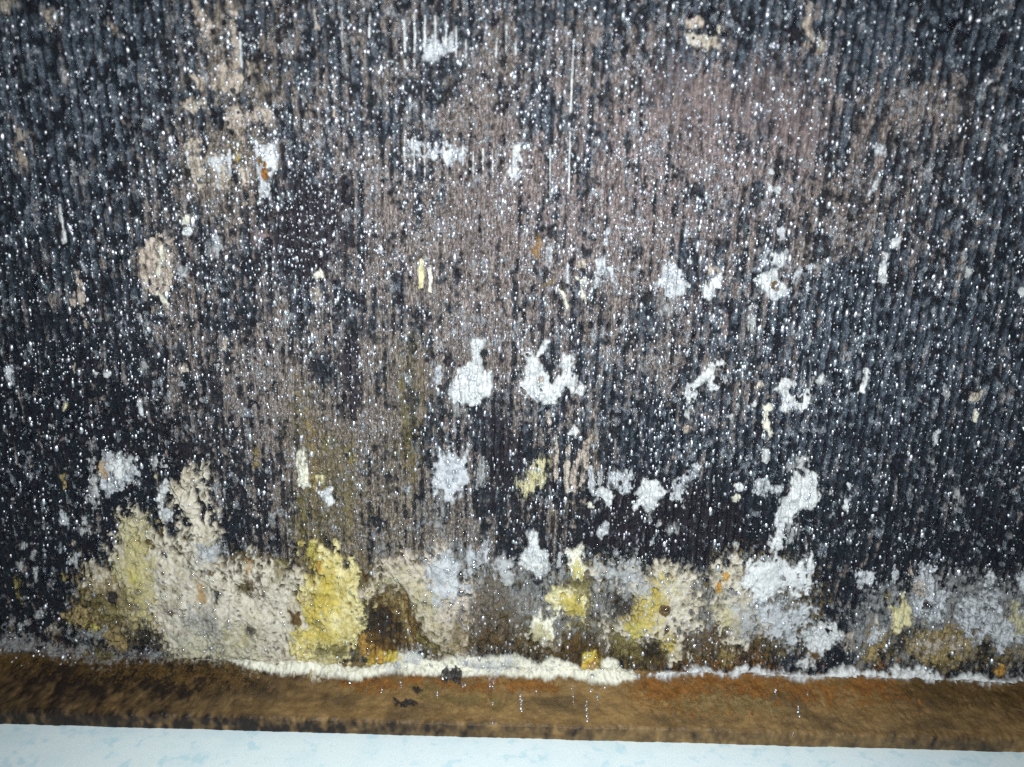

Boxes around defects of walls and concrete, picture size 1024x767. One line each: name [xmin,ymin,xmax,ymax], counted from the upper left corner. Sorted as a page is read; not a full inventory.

damp [504,142,523,188]
damp [762,164,782,194]
damp [182,214,195,236]
damp [211,235,224,258]
damp [241,163,383,303]
damp [558,228,622,309]
damp [654,259,730,316]
damp [746,226,816,332]
damp [877,236,902,284]
damp [0,334,1024,708]